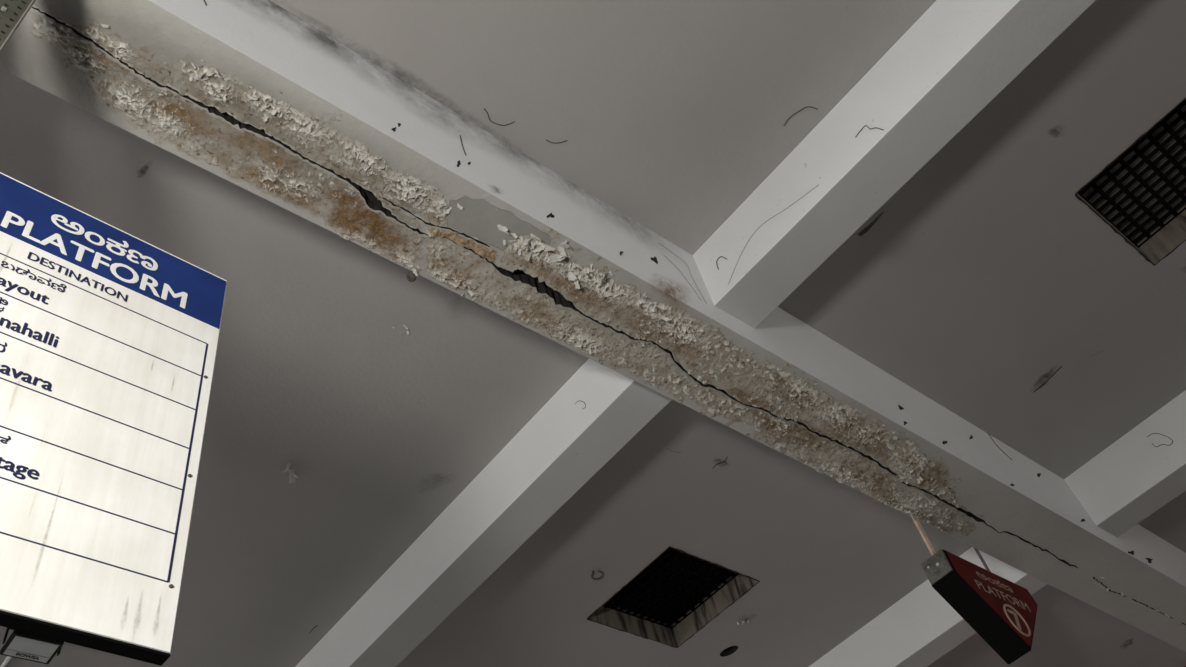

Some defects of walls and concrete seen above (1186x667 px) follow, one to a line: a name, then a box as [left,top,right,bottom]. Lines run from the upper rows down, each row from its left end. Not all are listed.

corrosion [334,193,400,249]
peeling [19,15,985,544]
crack [32,7,1078,568]
crack [1093,576,1186,625]